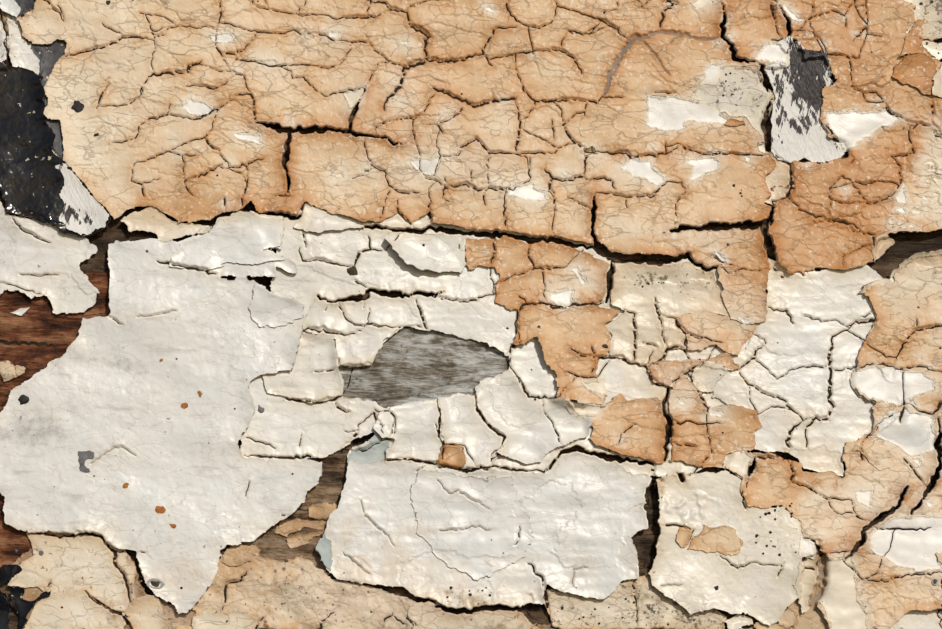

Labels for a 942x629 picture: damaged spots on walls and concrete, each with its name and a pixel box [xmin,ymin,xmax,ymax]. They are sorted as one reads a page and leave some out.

crack [0,12,10,60]
crack [43,0,64,22]
peeling [892,0,942,95]
crack [12,218,51,243]
crack [5,274,58,302]
crack [65,0,875,568]
crack [720,307,942,628]
crack [384,526,559,629]